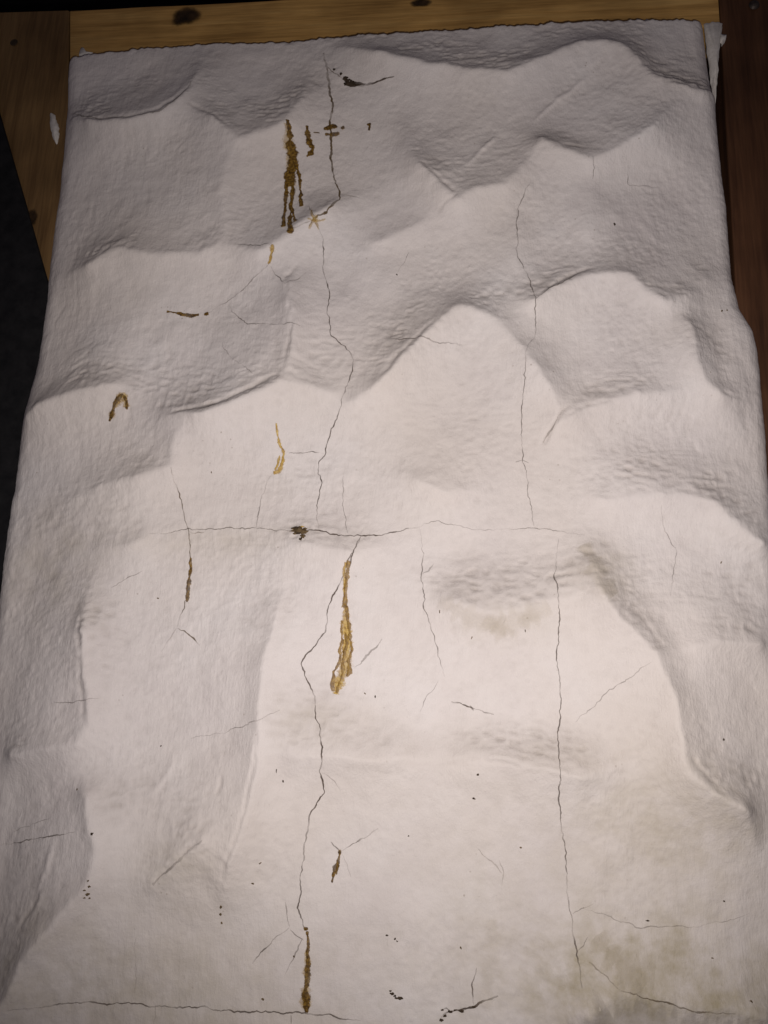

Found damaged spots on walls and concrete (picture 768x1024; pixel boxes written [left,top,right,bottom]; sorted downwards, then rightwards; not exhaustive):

rust [281,119,345,234]
crack [313,71,341,219]
rust [109,393,128,421]
rust [273,423,285,474]
rust [330,560,353,694]
crack [301,419,400,815]
crack [552,577,560,671]
crack [555,704,563,814]
rust [331,850,341,882]
crack [184,1006,342,1019]
rust [301,927,311,1013]
crack [452,983,483,1012]